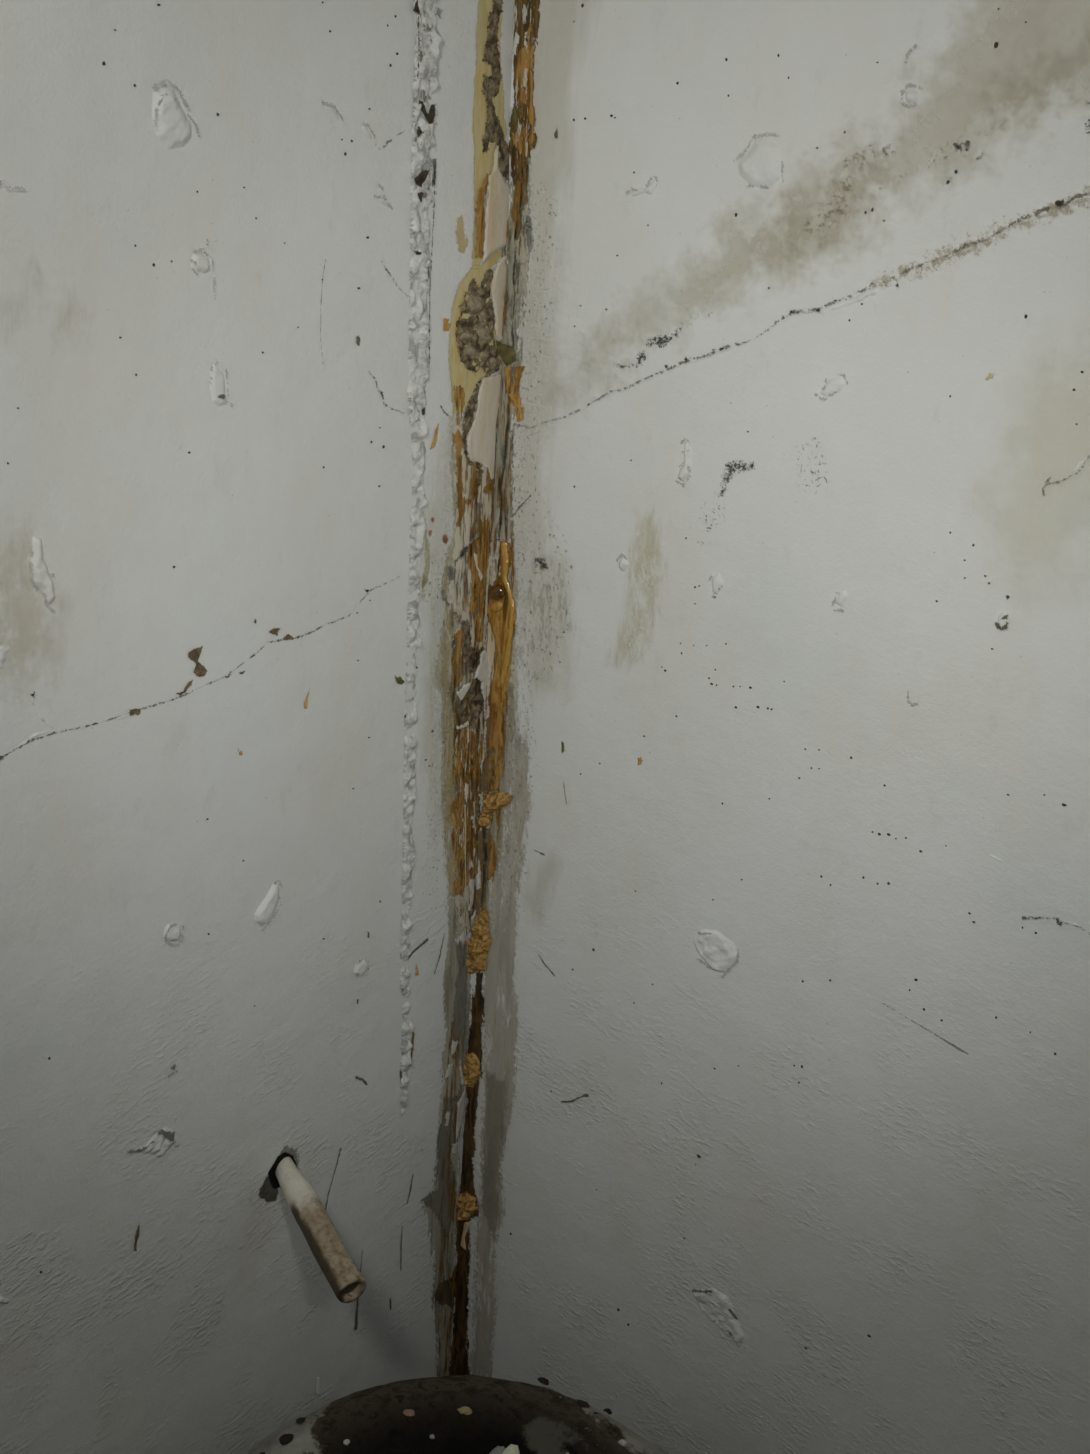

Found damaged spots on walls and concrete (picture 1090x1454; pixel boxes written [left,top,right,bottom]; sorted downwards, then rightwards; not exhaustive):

peeling [414,0,516,424]
water stain [616,314,699,368]
crack [429,192,1090,656]
crack [0,577,399,760]
spalling [455,618,489,737]
corrosion [435,0,540,1377]
crack [480,827,488,906]